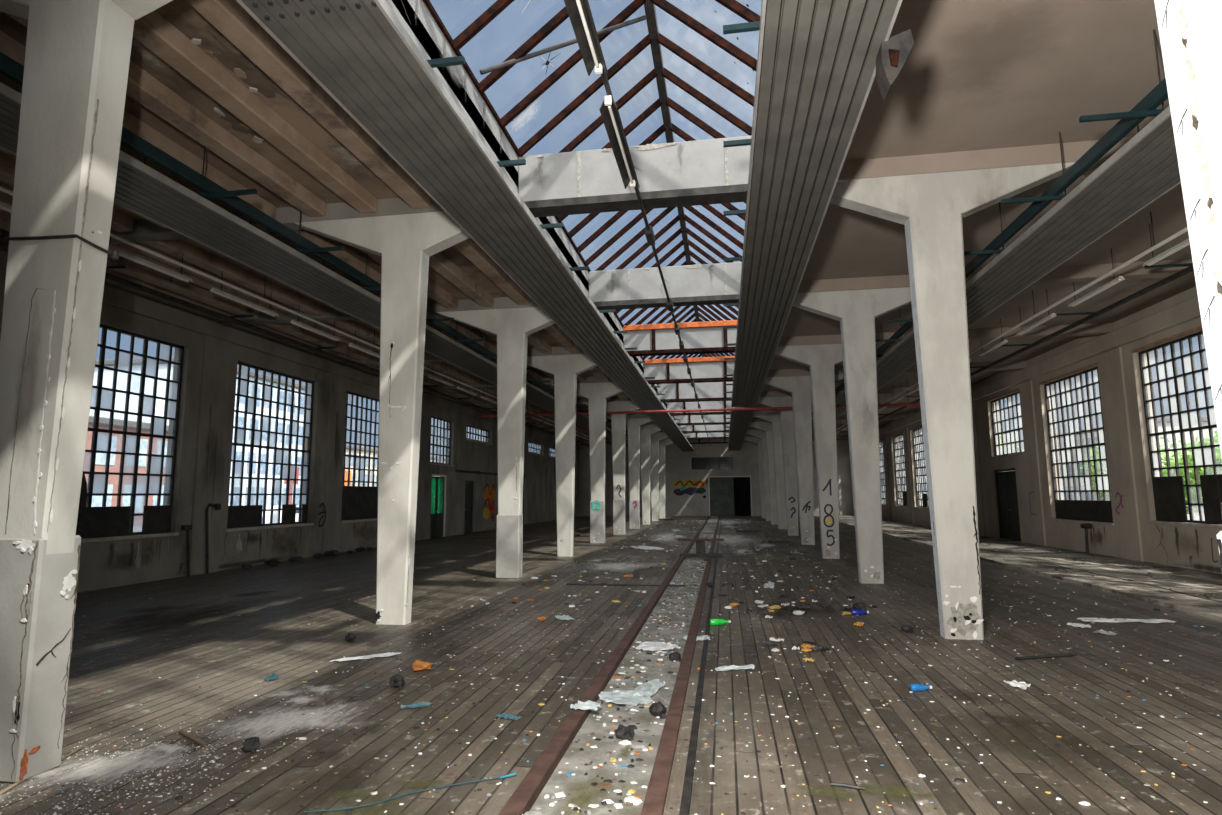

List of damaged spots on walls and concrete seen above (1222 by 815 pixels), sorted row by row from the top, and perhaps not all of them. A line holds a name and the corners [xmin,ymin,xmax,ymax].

crack [5,99,99,780]
spalling [1176,0,1222,329]